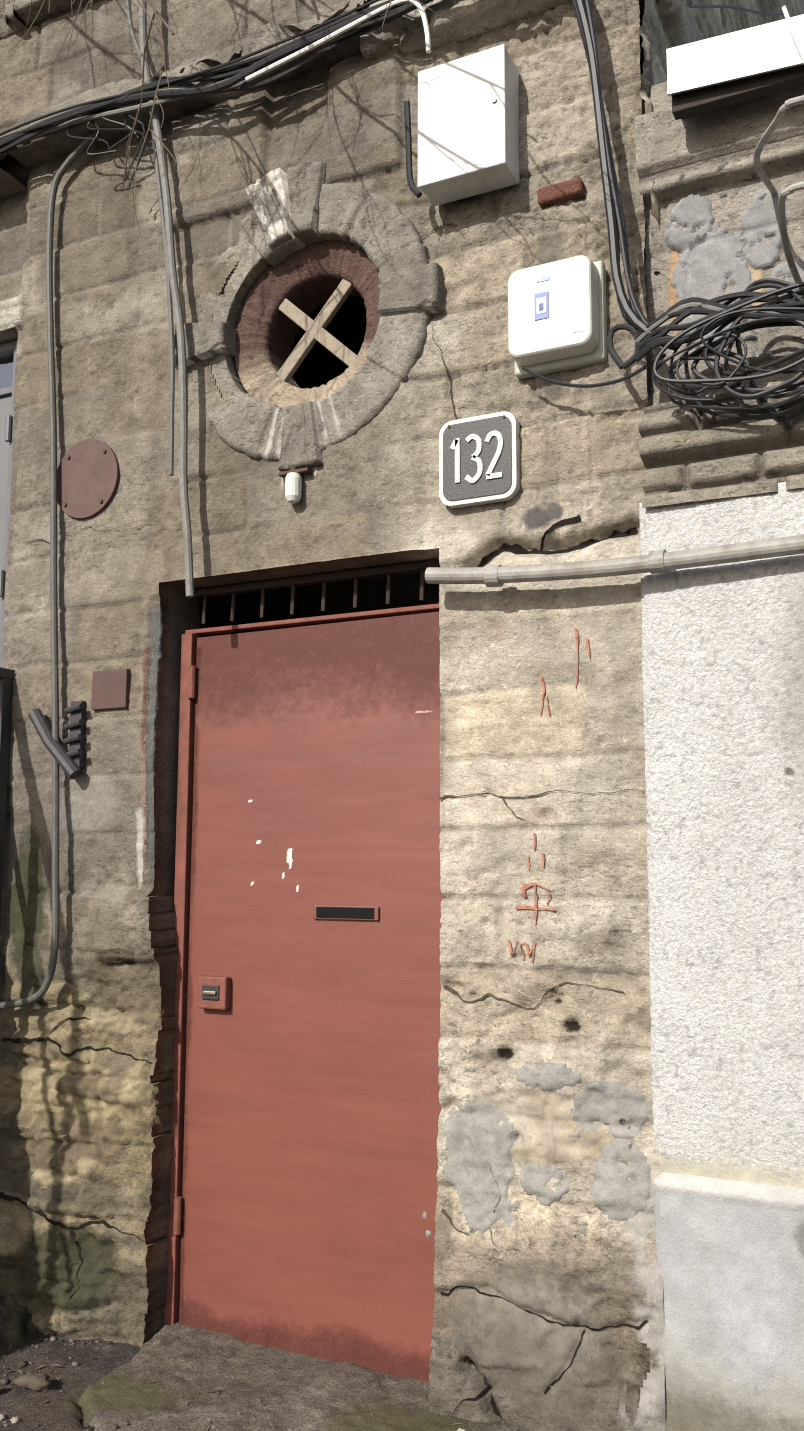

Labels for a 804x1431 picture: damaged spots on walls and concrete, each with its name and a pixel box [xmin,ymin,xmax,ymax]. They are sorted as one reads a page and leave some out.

spalling [245,168,290,241]
crack [478,515,637,567]
crack [2,1017,151,1063]
crack [0,1192,144,1299]
crack [441,1167,506,1254]
peeling [441,1061,665,1423]
crack [440,1286,648,1394]
crack [452,1360,502,1419]